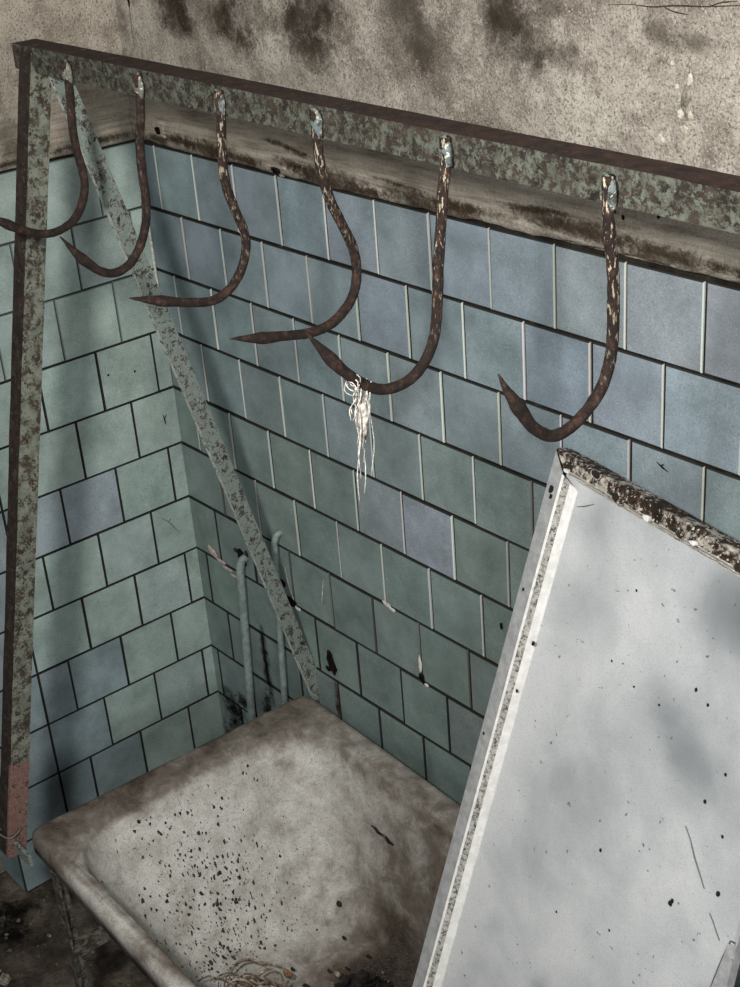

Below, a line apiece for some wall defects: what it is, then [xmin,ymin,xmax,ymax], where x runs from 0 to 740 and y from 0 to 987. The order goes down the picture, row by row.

damp [286,0,329,56]
damp [489,0,539,69]
crack [610,1,740,15]